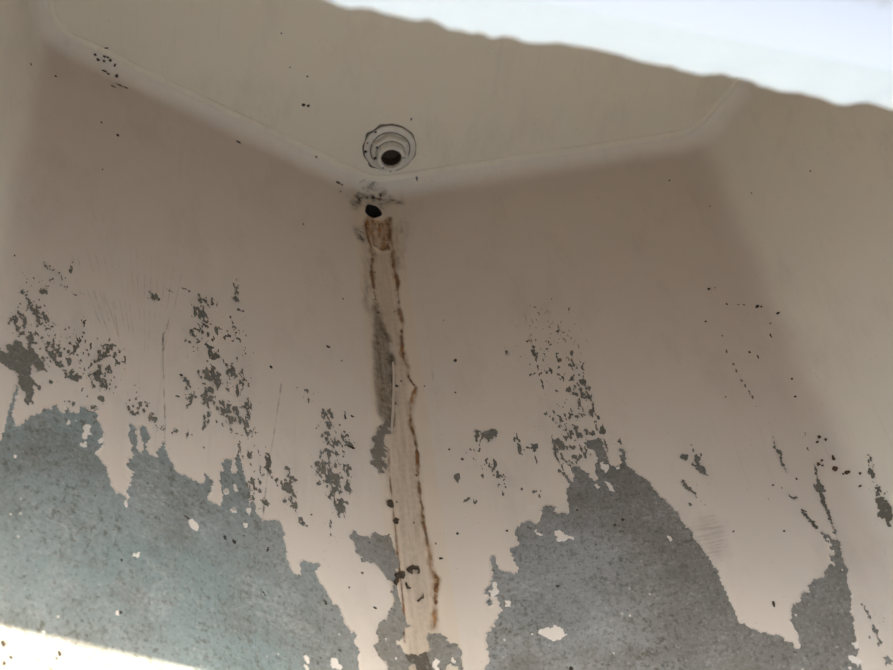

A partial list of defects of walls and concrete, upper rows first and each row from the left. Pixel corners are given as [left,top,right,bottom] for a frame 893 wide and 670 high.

rust [365,219,399,300]
leakage [374,306,393,422]
peeling [0,257,362,670]
peeling [370,418,391,474]
rust [409,418,432,560]
peeling [461,428,506,496]
peeling [482,306,883,670]
peeling [350,530,463,670]
rust [432,575,440,626]